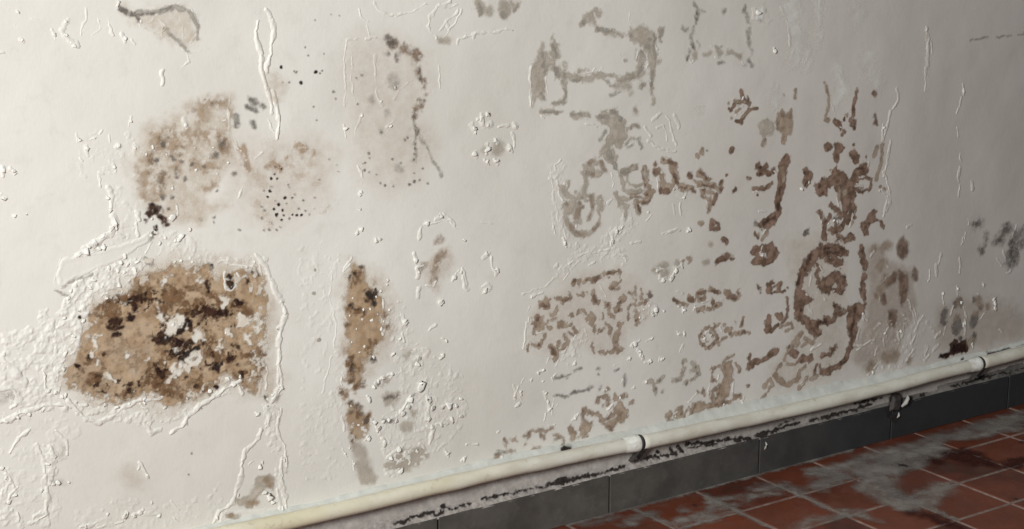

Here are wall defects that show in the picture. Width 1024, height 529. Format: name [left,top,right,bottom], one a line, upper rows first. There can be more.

leakage [133,98,315,231]
leakage [332,34,425,138]
leakage [404,100,443,185]
peeling [495,7,892,459]
spalling [0,115,289,529]